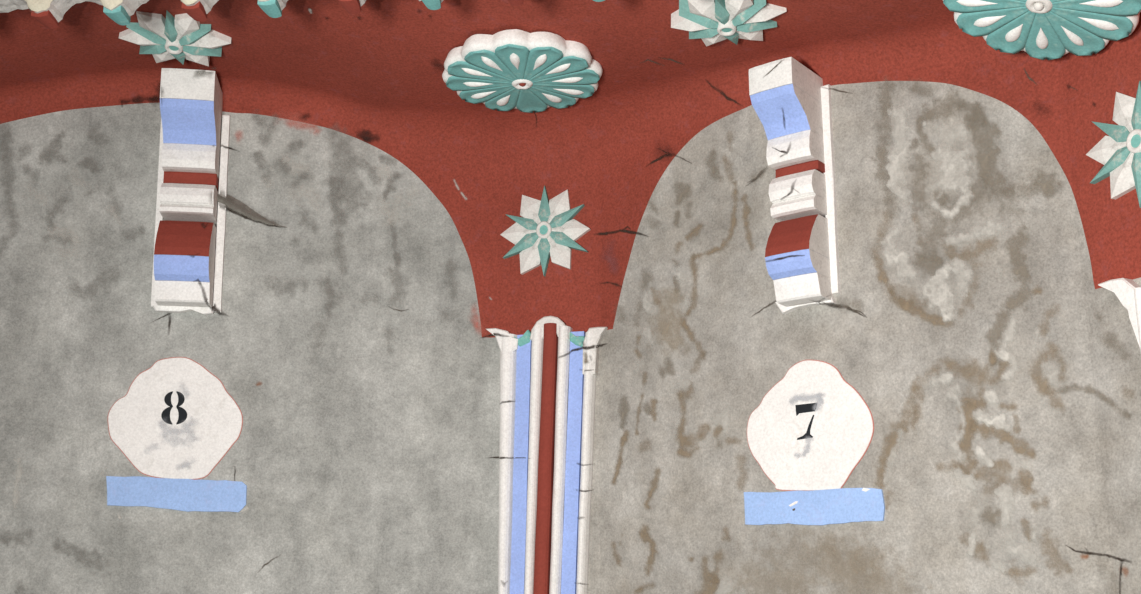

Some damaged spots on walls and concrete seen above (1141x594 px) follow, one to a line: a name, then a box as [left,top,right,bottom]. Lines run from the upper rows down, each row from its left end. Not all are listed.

water stain [878,95,1011,218]
crack [599,226,645,236]
crack [197,280,222,315]
water stain [637,185,751,356]
crack [818,302,863,316]
water stain [878,228,972,325]
crack [564,344,605,356]
water stain [932,232,1041,559]
water stain [1035,356,1130,417]
water stain [613,395,657,484]
water stain [640,527,656,574]
crack [1069,547,1125,594]